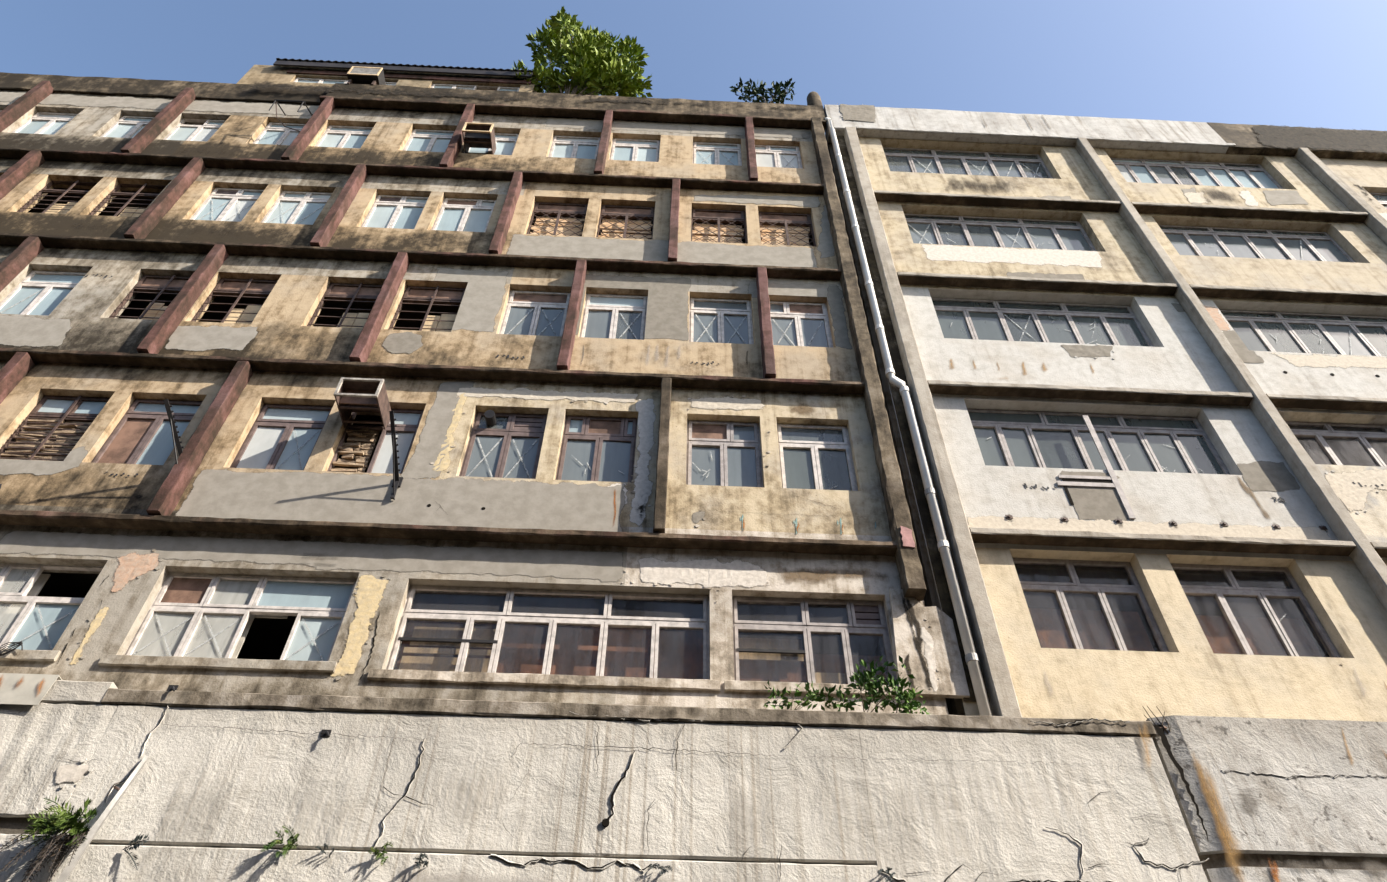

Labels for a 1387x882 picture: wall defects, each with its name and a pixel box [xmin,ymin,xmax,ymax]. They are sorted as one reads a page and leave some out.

peeling [1325,469,1387,514]
peeling [68,549,164,664]
peeling [330,575,392,681]
crack [59,705,434,849]
crack [490,711,1209,882]
corrosion [1196,762,1238,871]
crack [1221,769,1387,780]